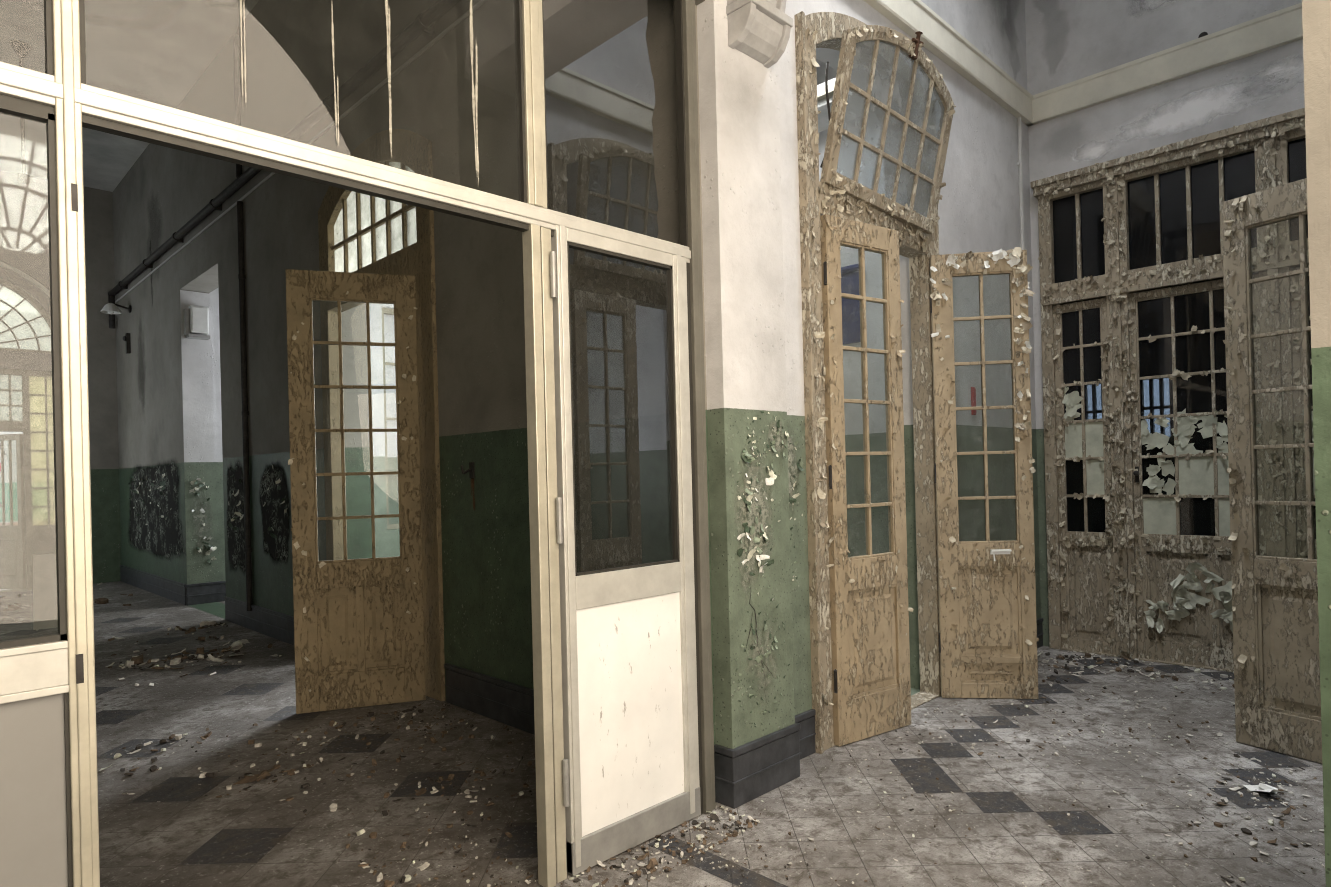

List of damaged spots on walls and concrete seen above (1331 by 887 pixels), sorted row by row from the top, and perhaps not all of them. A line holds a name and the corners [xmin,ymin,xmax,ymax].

spalling [807,25,1317,643]
peeling [128,461,246,573]
peeling [736,411,855,727]
peeling [1234,643,1255,684]